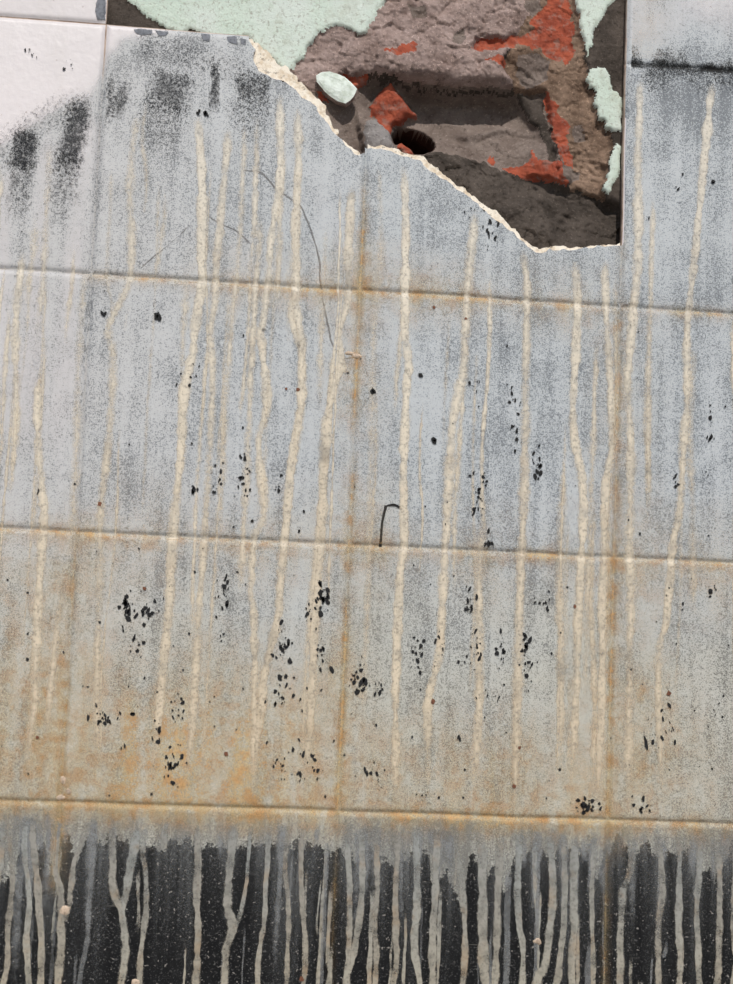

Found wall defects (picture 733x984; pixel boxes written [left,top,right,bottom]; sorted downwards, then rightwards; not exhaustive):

spalling [95,0,625,253]
rust [111,713,284,814]
rust [391,812,547,826]
water stain [0,922,11,984]
water stain [28,878,43,984]
water stain [137,876,149,984]
water stain [221,862,237,984]
water stain [240,877,249,915]
water stain [278,847,288,872]
water stain [283,872,292,940]
water stain [585,961,596,984]
water stain [657,878,666,908]